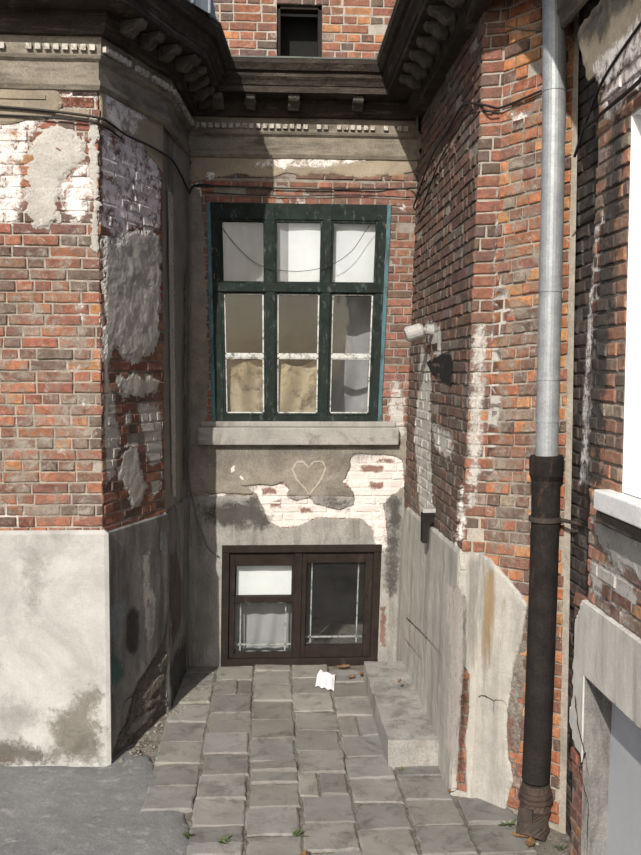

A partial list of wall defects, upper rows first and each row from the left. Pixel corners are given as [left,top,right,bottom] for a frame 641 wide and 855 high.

peeling [0,119,45,226]
peeling [150,470,162,495]
damp [201,493,269,530]
spalling [231,454,404,548]
spalling [112,551,182,759]